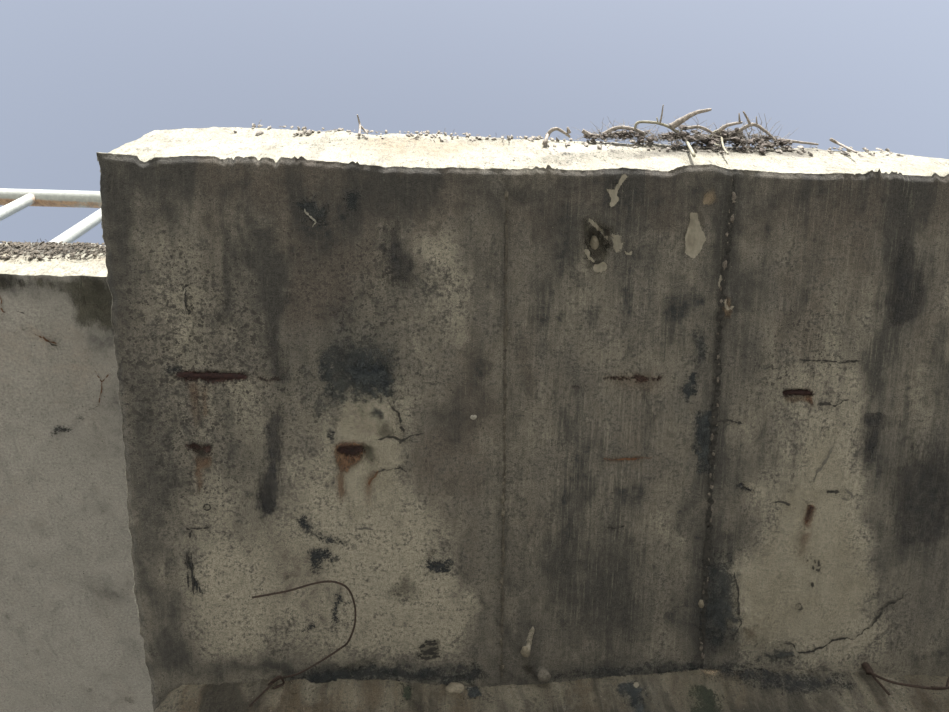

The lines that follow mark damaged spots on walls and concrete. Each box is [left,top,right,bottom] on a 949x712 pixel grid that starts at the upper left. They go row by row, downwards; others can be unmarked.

leakage [257,407,283,516]
leakage [864,412,887,461]
leakage [892,444,949,548]